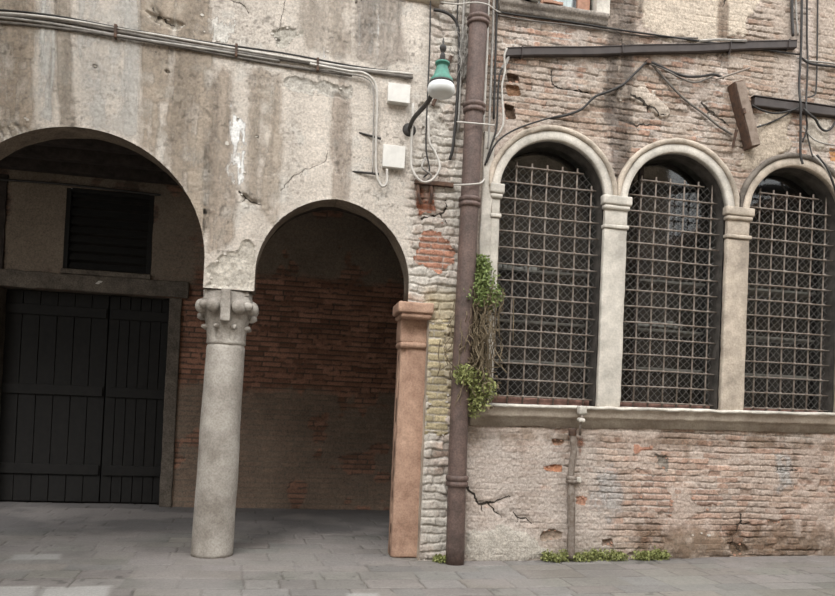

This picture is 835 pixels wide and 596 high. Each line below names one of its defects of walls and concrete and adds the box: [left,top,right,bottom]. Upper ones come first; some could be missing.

leakage [0,0,94,129]
flaking render [0,117,33,142]
leakage [89,0,235,250]
leakage [248,70,282,223]
flaking render [205,239,256,291]
flaking render [413,222,456,274]
crack [466,486,532,524]